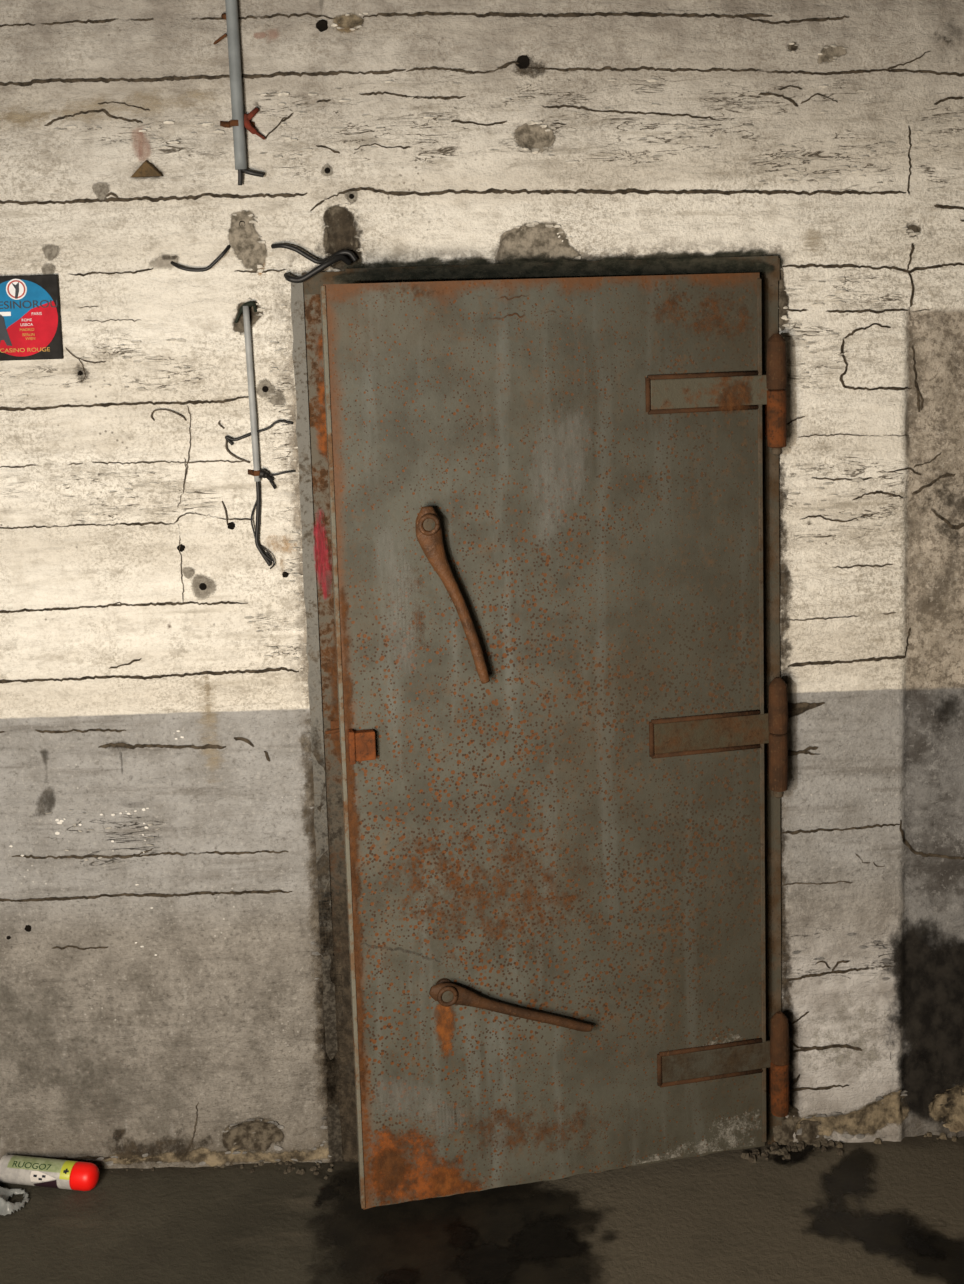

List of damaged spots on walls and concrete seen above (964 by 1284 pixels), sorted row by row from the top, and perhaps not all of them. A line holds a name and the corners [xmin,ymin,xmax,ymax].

crack [0,51,964,139]
crack [0,126,964,222]
spalling [228,210,267,273]
spalling [492,222,582,264]
crack [781,235,964,530]
crack [0,347,254,613]
rust [329,593,366,1101]
rust [435,1005,454,1056]
leakage [891,921,964,1123]
spalling [766,1089,910,1145]
spalling [929,1085,964,1133]
rust [366,1130,480,1206]